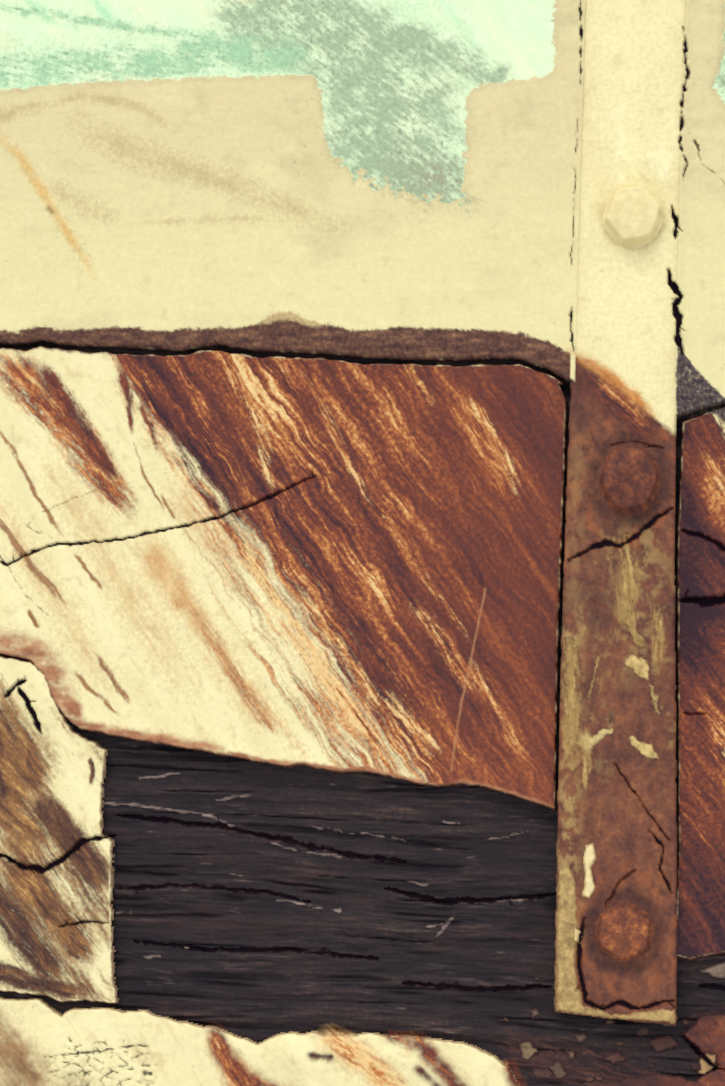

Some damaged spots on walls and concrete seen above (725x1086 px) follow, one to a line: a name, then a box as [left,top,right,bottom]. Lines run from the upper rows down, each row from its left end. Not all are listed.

crack [577,0,585,85]
peeling [0,0,515,227]
crack [567,306,575,353]
crack [0,467,317,617]
corrosion [0,309,665,804]
crack [565,507,725,562]
corrosion [676,414,725,958]
crack [0,814,556,906]
crack [402,762,725,1071]
peeling [699,961,725,979]
peeling [518,1032,588,1082]
peeling [691,1052,718,1075]